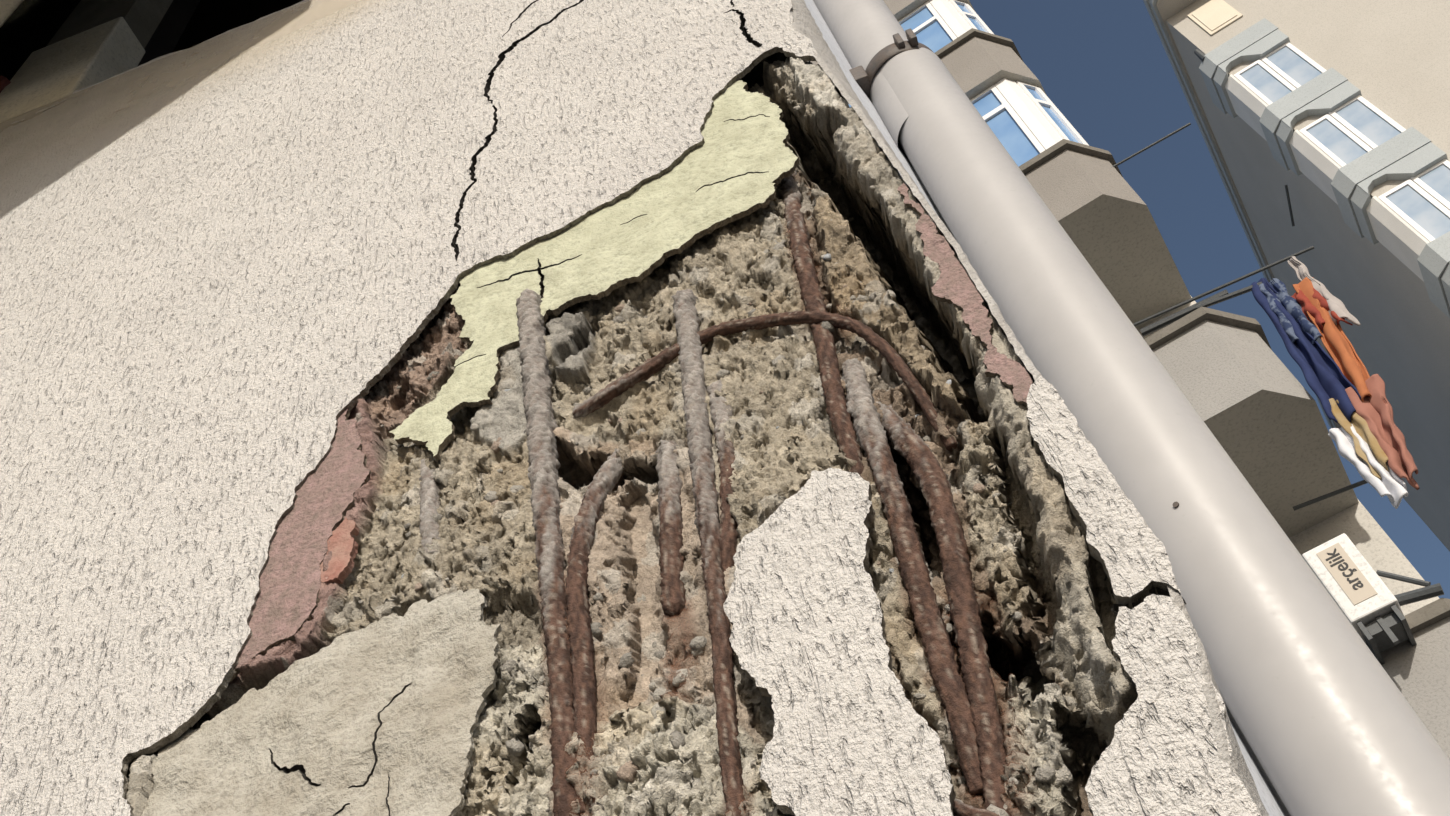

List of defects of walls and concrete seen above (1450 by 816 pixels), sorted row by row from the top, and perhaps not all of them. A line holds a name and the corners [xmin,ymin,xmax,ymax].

crack [723,0,767,64]
crack [451,0,584,298]
spalling [126,57,1138,816]
corrosion [669,639,687,696]
crack [1111,587,1186,617]
crack [269,684,411,816]